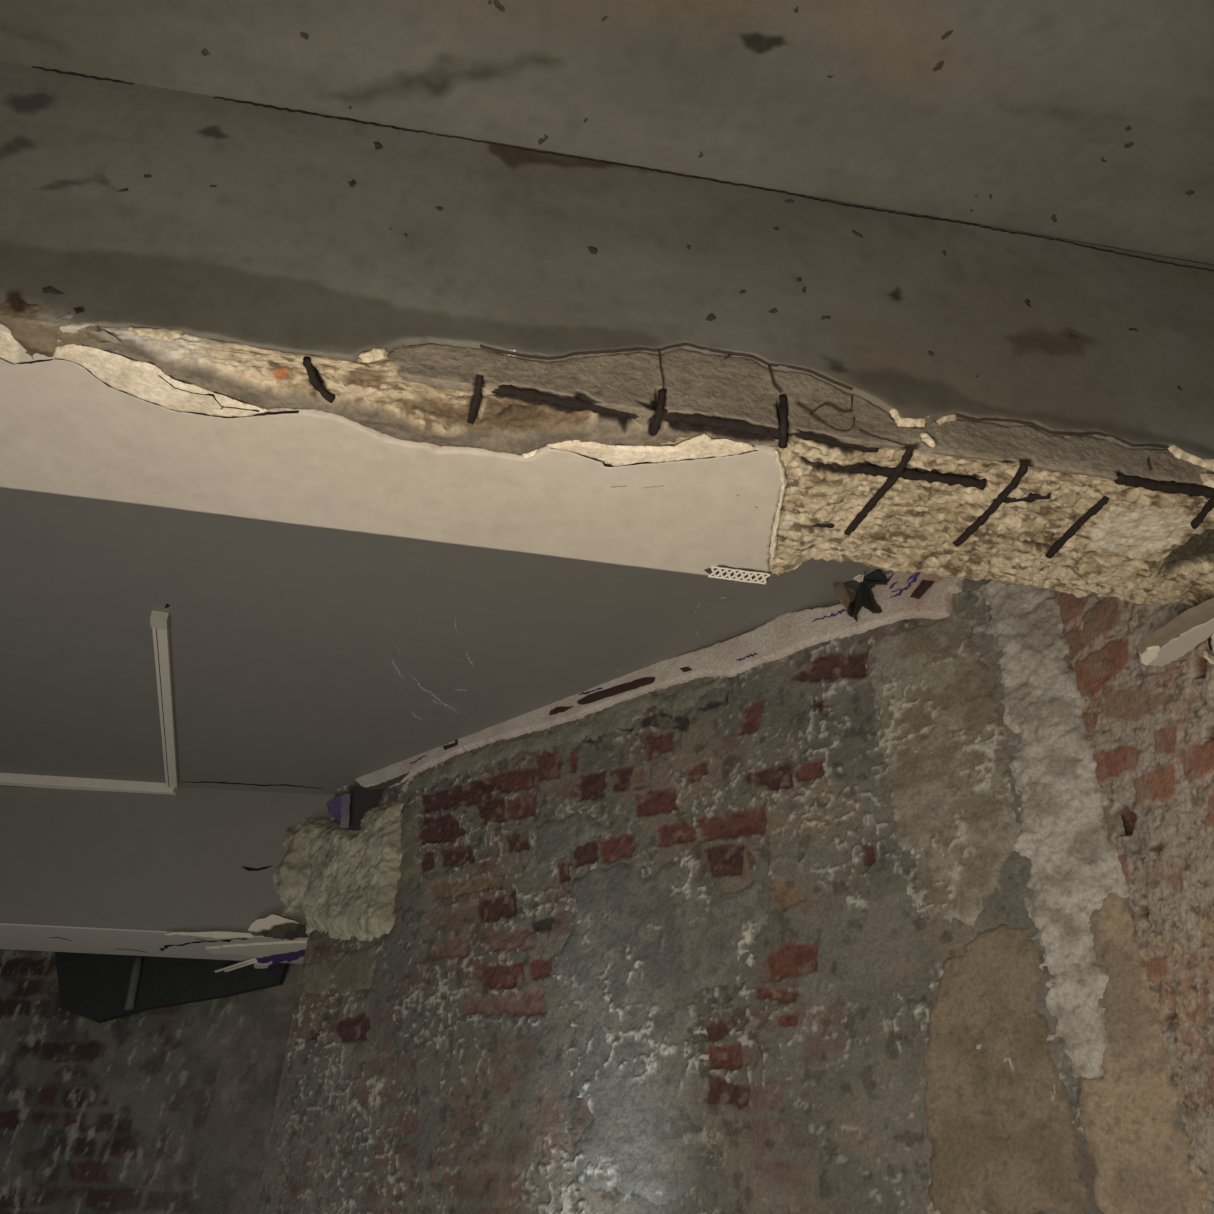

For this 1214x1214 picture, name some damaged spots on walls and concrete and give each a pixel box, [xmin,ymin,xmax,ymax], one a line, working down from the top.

crack [32,66,134,85]
crack [213,97,1214,272]
spalling [0,286,1214,666]
crack [480,343,905,446]
crack [181,781,323,789]
spalling [164,801,404,969]
flaking render [923,924,1086,1214]